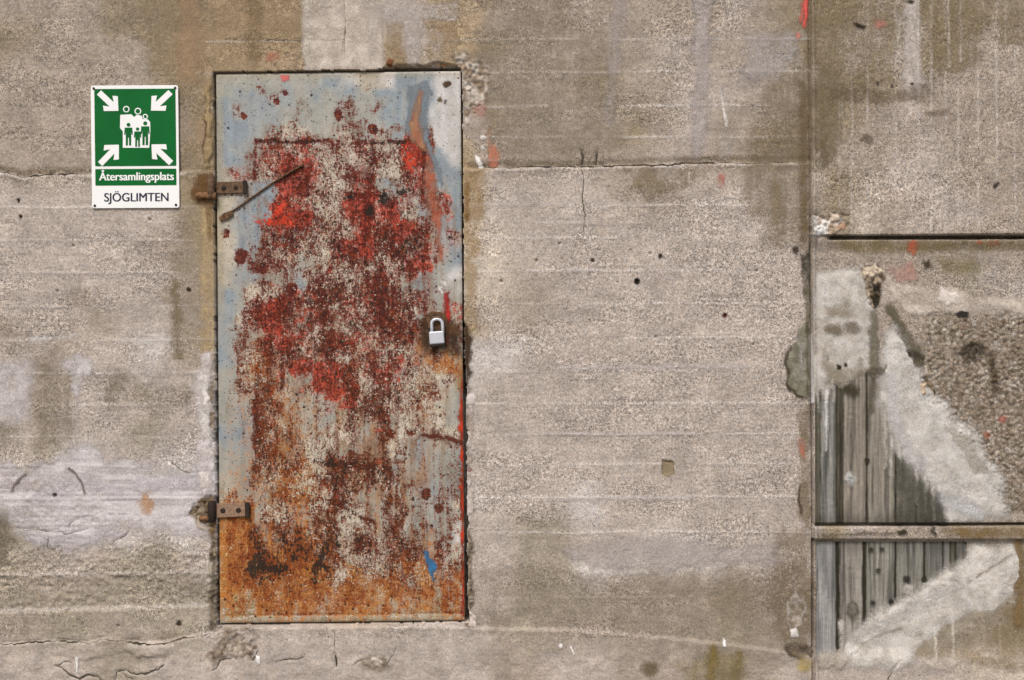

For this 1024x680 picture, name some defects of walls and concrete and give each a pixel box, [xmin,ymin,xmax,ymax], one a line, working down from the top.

corrosion [409,89,443,261]
crack [476,151,806,231]
spalling [861,264,886,307]
leakage [743,0,1024,525]
peeling [784,321,810,399]
spalling [911,286,1024,508]
corrosion [421,433,463,445]
leakage [0,444,216,558]
crack [0,630,218,680]
crack [212,652,305,670]